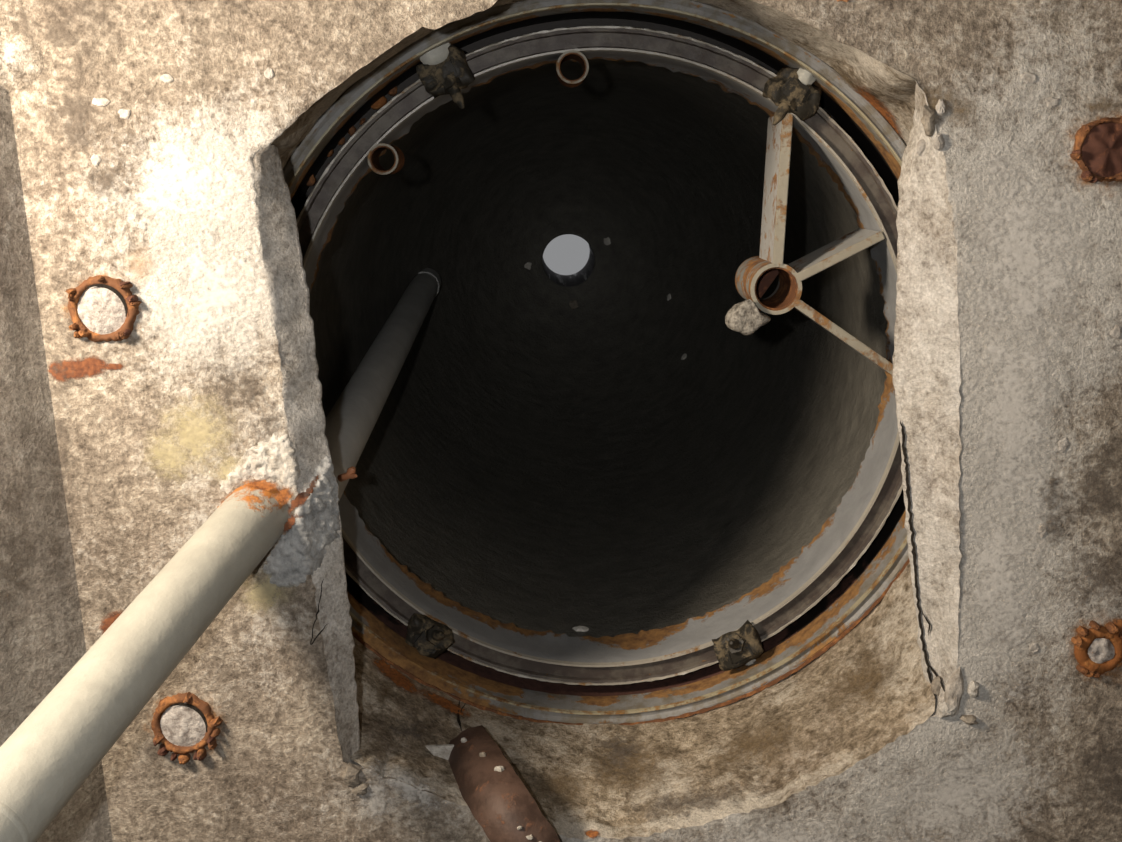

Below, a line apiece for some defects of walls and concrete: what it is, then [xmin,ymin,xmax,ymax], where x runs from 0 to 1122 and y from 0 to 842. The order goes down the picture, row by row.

rust [1070,149,1122,187]
rust [119,281,142,307]
rust [65,319,90,338]
rust [115,329,132,341]
rust [48,356,123,382]
rust [244,475,321,532]
crack [900,420,945,697]
rust [100,612,123,633]
rust [1071,619,1122,649]
rust [147,711,223,764]